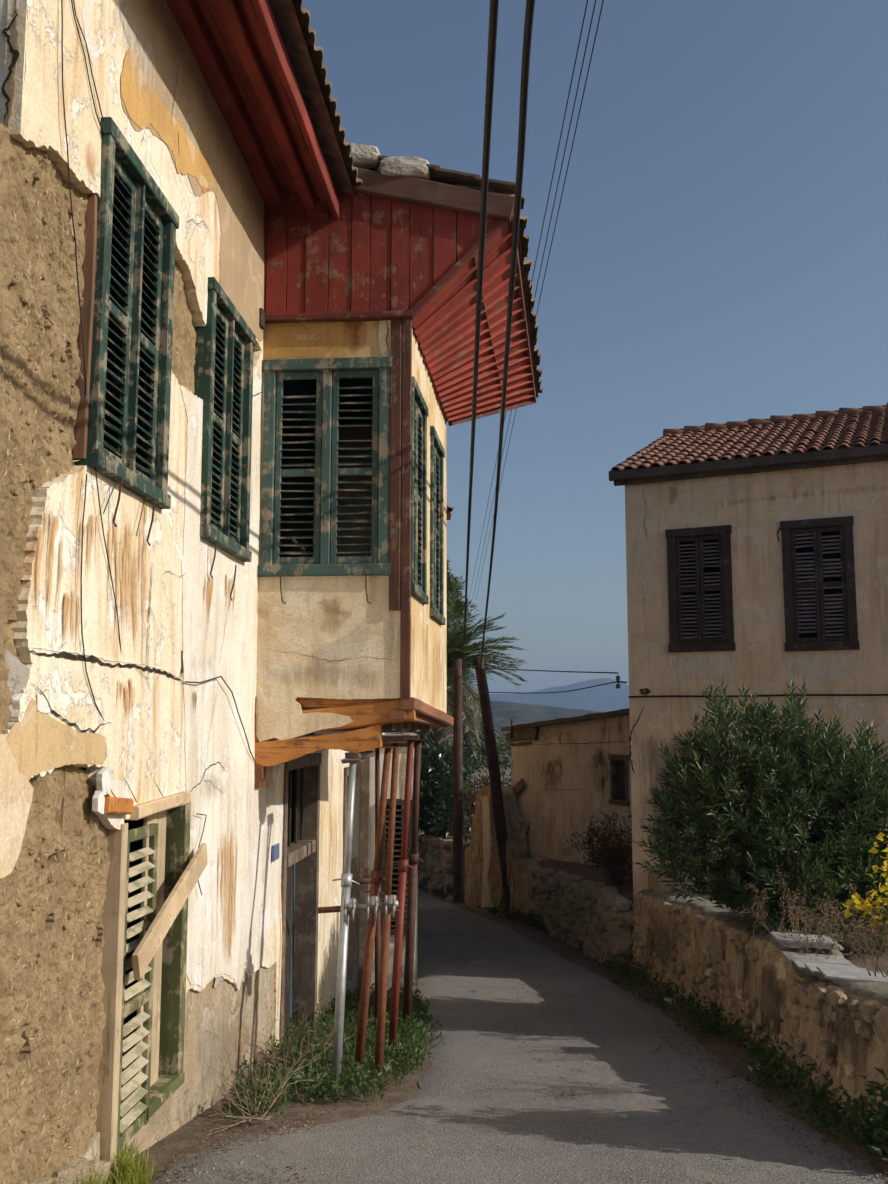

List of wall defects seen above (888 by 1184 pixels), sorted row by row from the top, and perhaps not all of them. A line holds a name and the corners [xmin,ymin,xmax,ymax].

crack [1,10,19,124]
peeling [119,0,391,360]
spalling [0,0,129,1184]
crack [30,563,186,719]
crack [31,683,134,769]